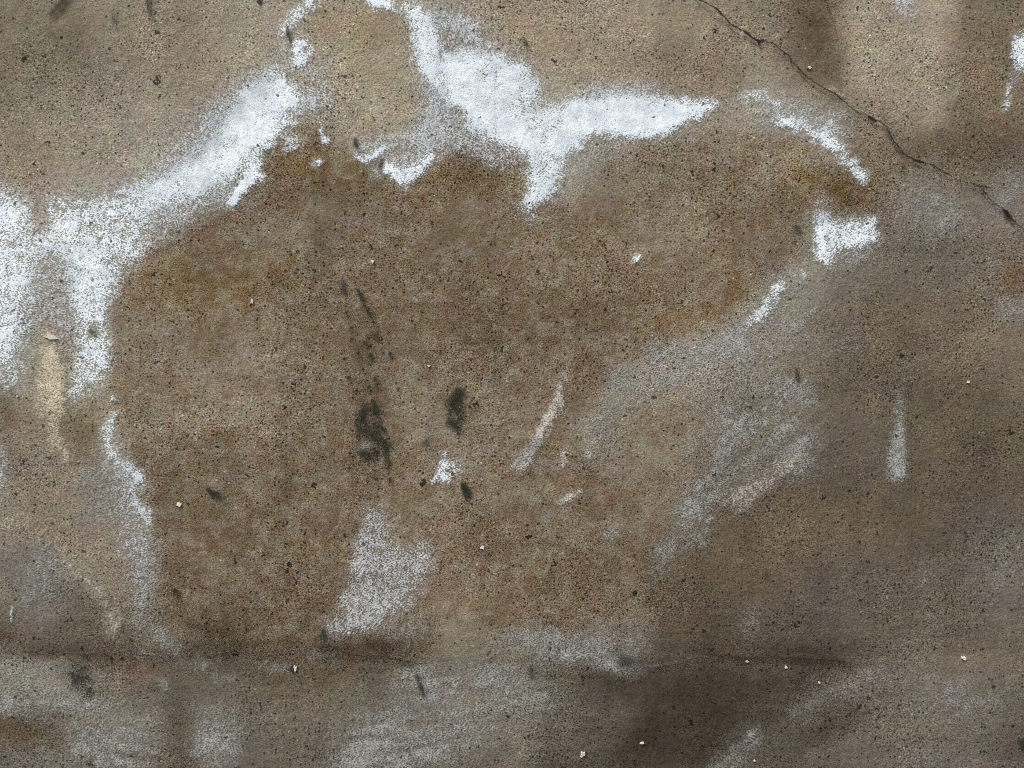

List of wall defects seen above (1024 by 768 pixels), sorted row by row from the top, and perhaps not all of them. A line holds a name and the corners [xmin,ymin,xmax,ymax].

water stain [353,0,718,216]
water stain [744,90,870,183]
crack [699,0,1022,228]
water stain [813,209,879,265]
water stain [341,280,392,371]
water stain [651,280,785,389]
water stain [102,395,152,524]
water stain [348,377,396,482]
water stain [431,452,472,501]
water stain [444,387,466,435]
water stain [681,368,815,526]
water stain [319,513,430,640]